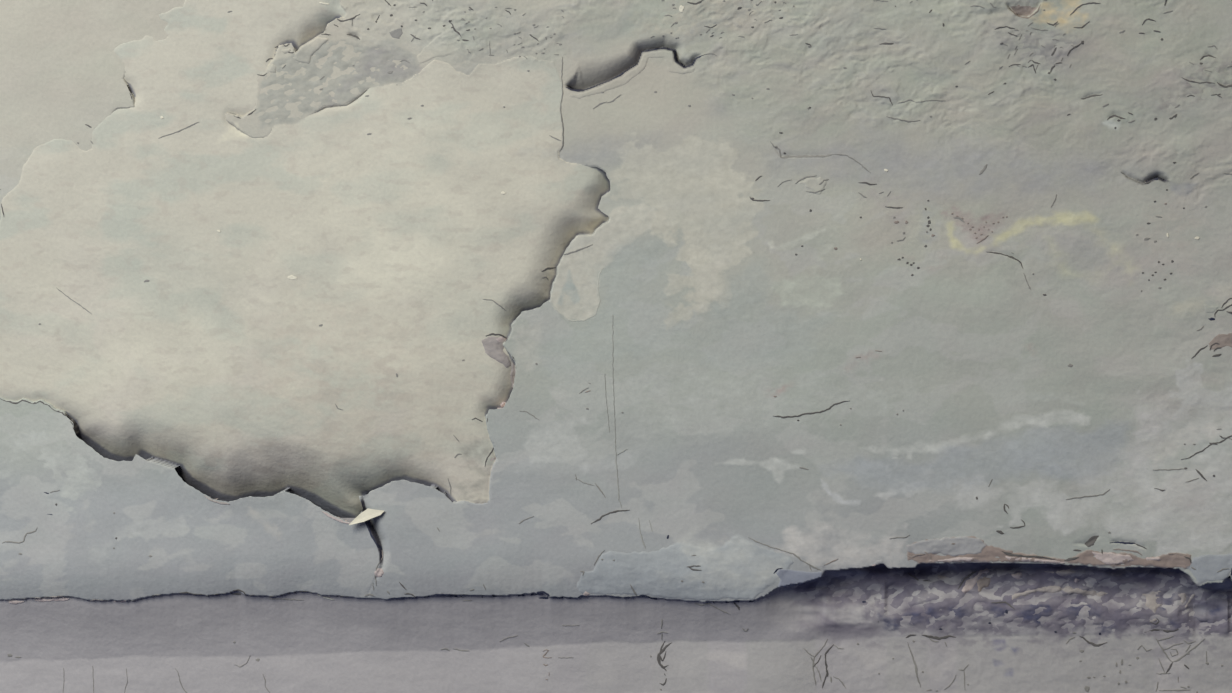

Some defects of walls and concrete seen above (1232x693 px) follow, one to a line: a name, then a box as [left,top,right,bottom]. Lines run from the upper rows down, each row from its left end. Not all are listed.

flaking render [0,0,610,525]
spalling [1191,298,1232,359]
crack [3,490,59,555]
crack [9,520,587,680]